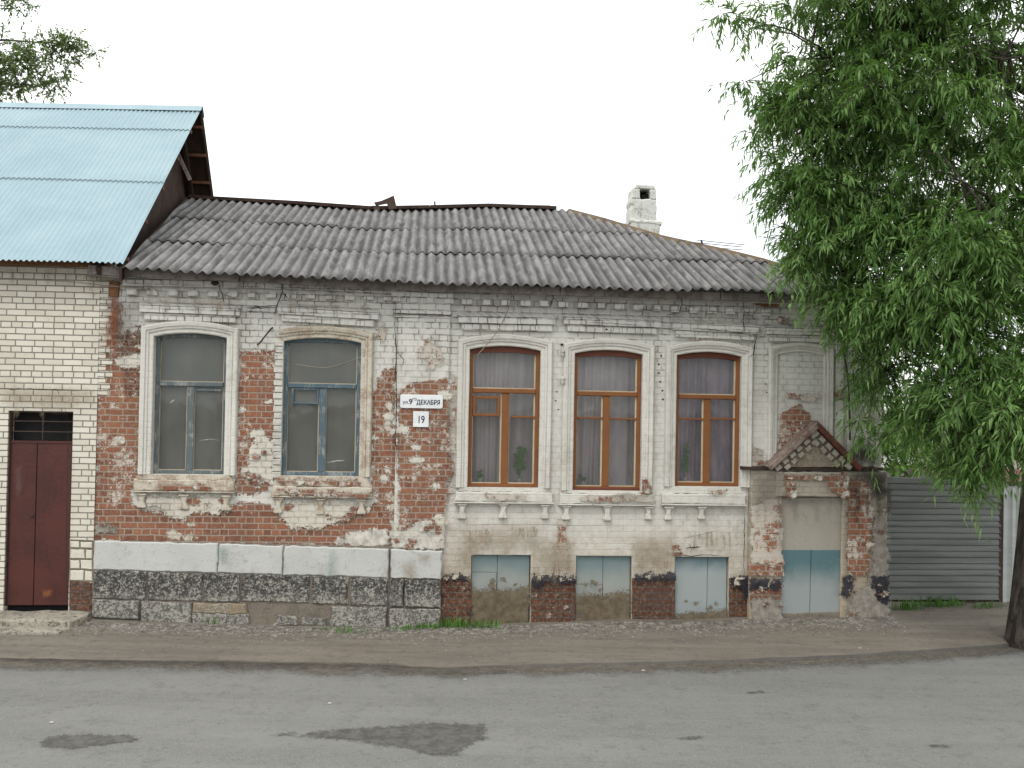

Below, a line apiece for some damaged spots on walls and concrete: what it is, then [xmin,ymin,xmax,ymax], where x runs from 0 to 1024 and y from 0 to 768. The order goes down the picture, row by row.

peeling [94,303,457,550]
peeling [777,392,821,449]
peeling [734,472,890,608]